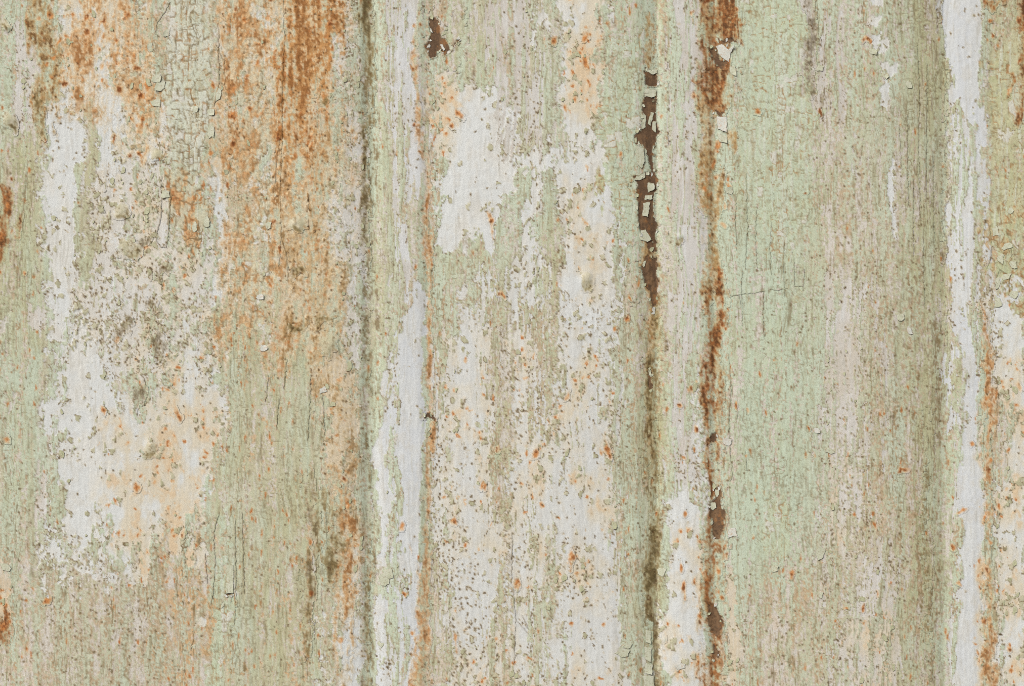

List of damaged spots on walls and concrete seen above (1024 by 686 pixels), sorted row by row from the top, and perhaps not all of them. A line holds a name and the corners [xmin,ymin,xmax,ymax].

peeling [0,15,234,643]
rust [22,0,371,686]
crack [147,0,326,439]
peeling [306,0,750,686]
rust [675,0,750,686]
peeling [935,0,1024,686]
rust [969,300,1013,686]